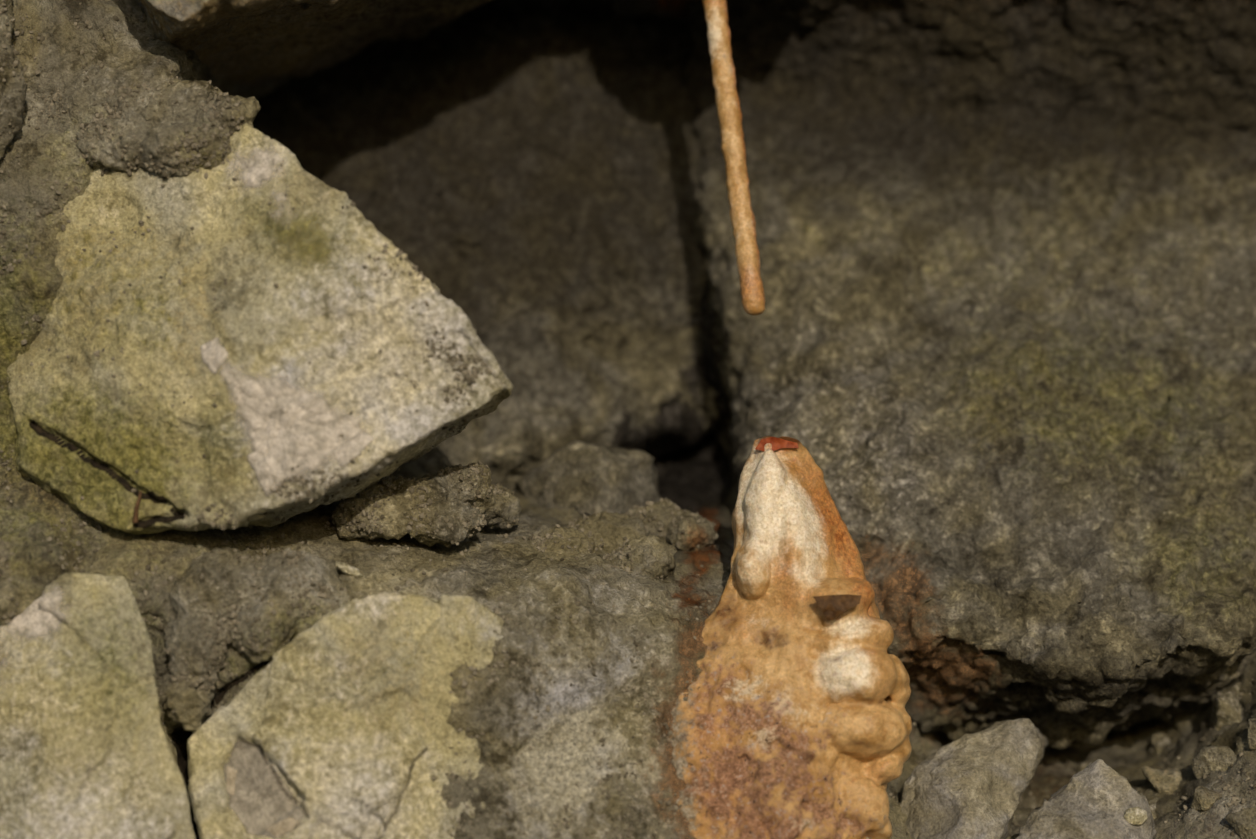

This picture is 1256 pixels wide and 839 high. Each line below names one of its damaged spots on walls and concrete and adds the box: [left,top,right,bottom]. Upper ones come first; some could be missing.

crack [29,421,186,529]